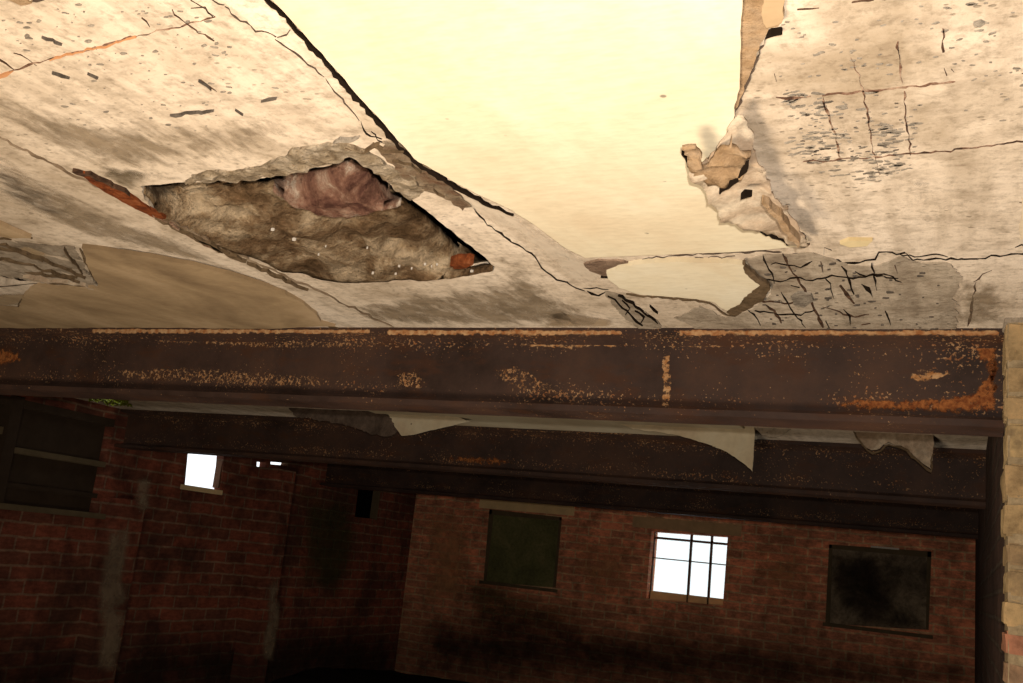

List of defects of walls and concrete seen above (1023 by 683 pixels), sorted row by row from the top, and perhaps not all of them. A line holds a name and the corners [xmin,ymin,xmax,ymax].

rust [72,168,213,250]
spalling [143,135,493,283]
spalling [0,240,98,290]
spalling [584,259,628,278]
spalling [605,291,661,329]
crack [644,250,797,259]
spalling [674,252,963,330]
rust [679,270,999,347]
crack [824,244,1023,264]
rust [662,346,675,406]
rust [841,348,998,413]
peeling [853,431,934,473]